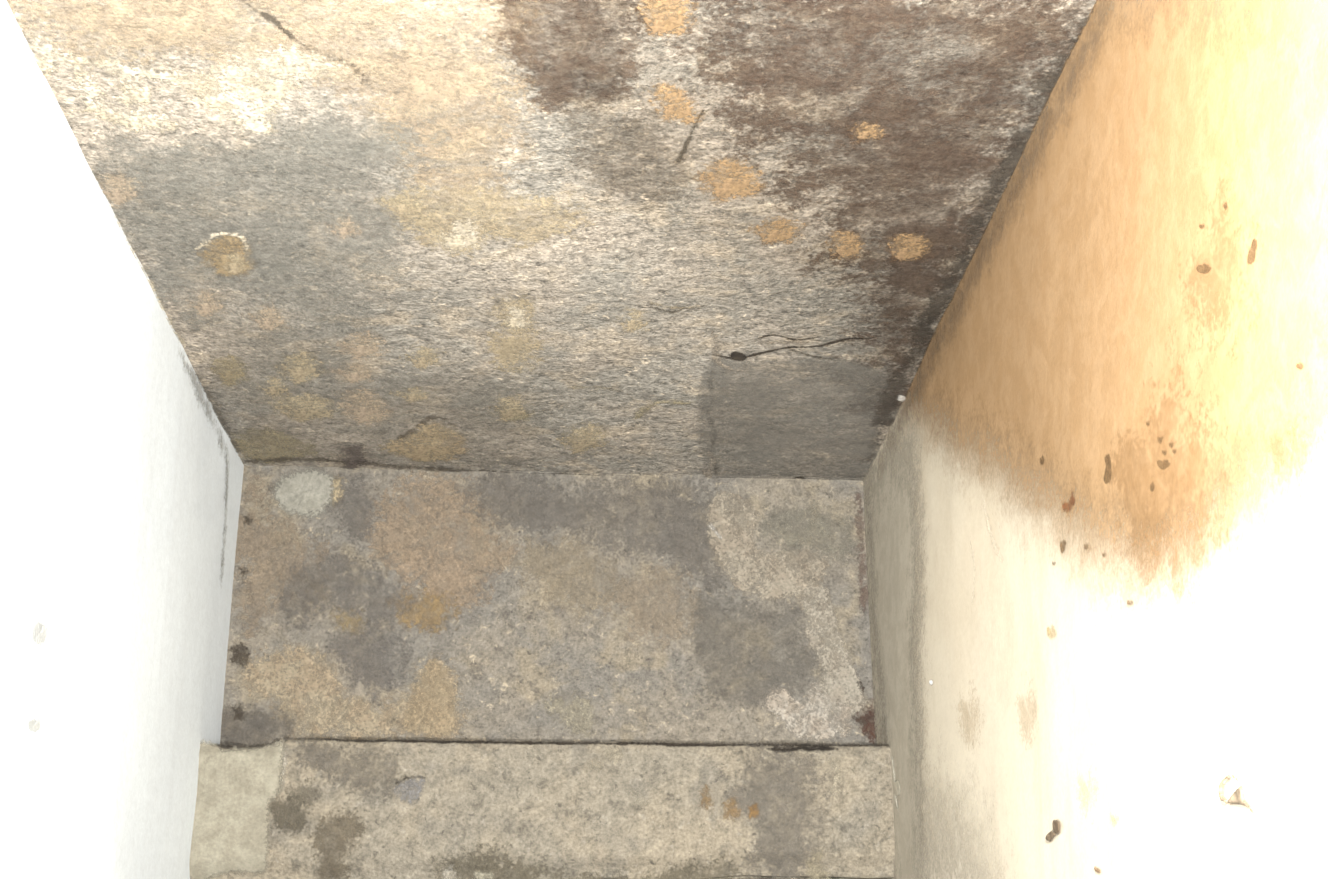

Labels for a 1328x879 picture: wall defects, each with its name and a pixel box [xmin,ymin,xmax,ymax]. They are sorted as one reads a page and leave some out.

crack [249,5,368,83]
damp [493,0,650,115]
crack [651,302,867,478]
crack [213,737,887,753]